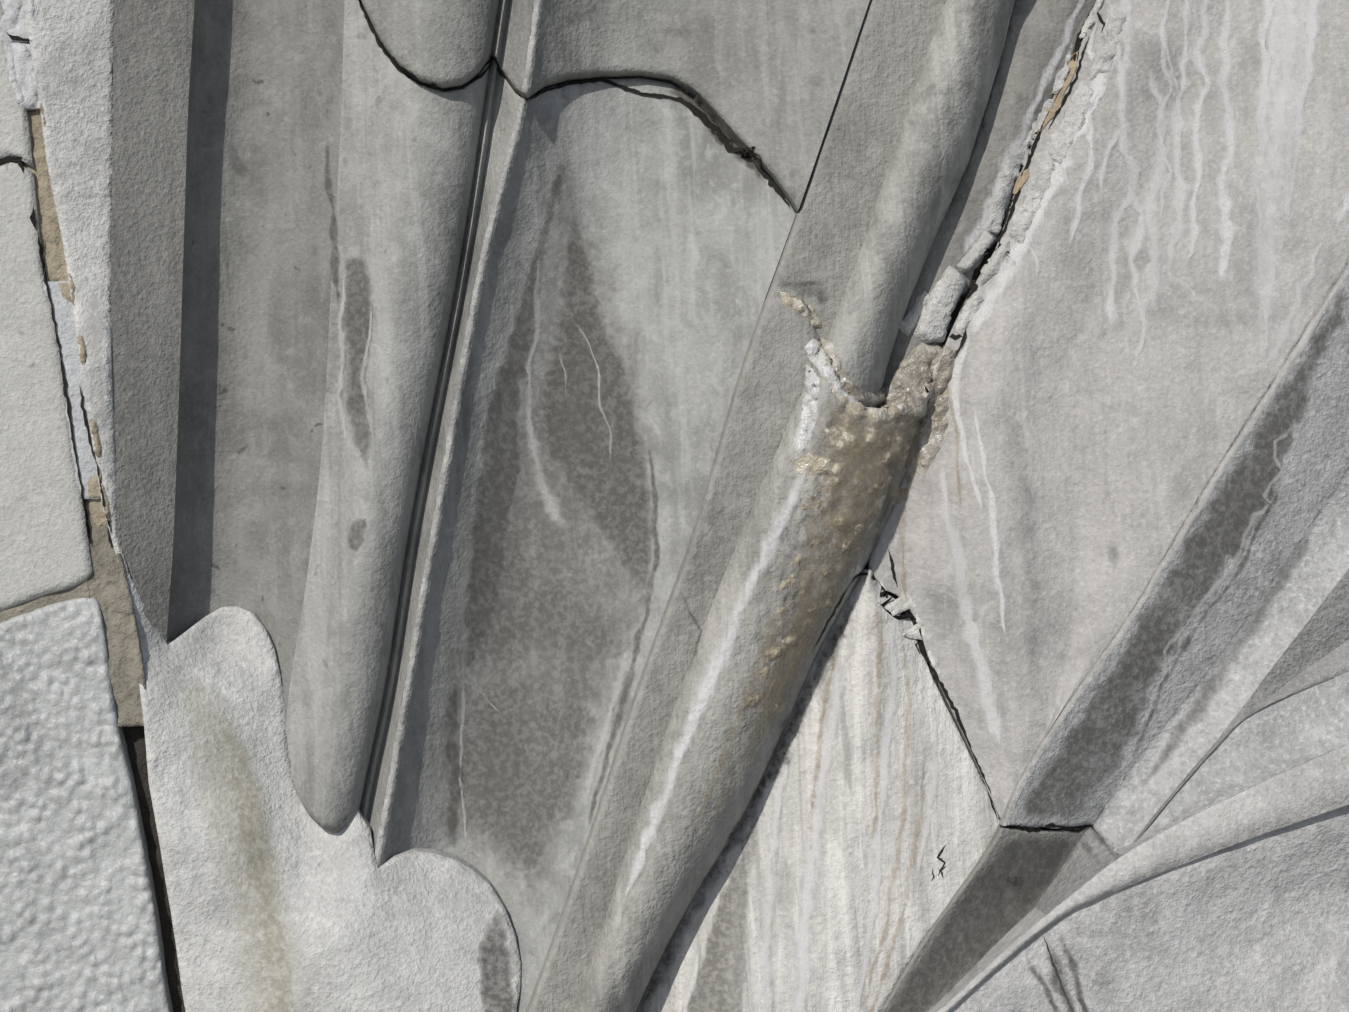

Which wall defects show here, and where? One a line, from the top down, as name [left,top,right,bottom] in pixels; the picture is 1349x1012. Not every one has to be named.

crack [358,0,492,92]
crack [526,79,789,206]
peeling [899,0,1127,344]
damp [468,255,659,736]
damp [615,0,1237,1012]
damp [1027,0,1340,813]
damp [446,693,569,851]
damp [588,608,648,814]
crack [812,550,1103,841]